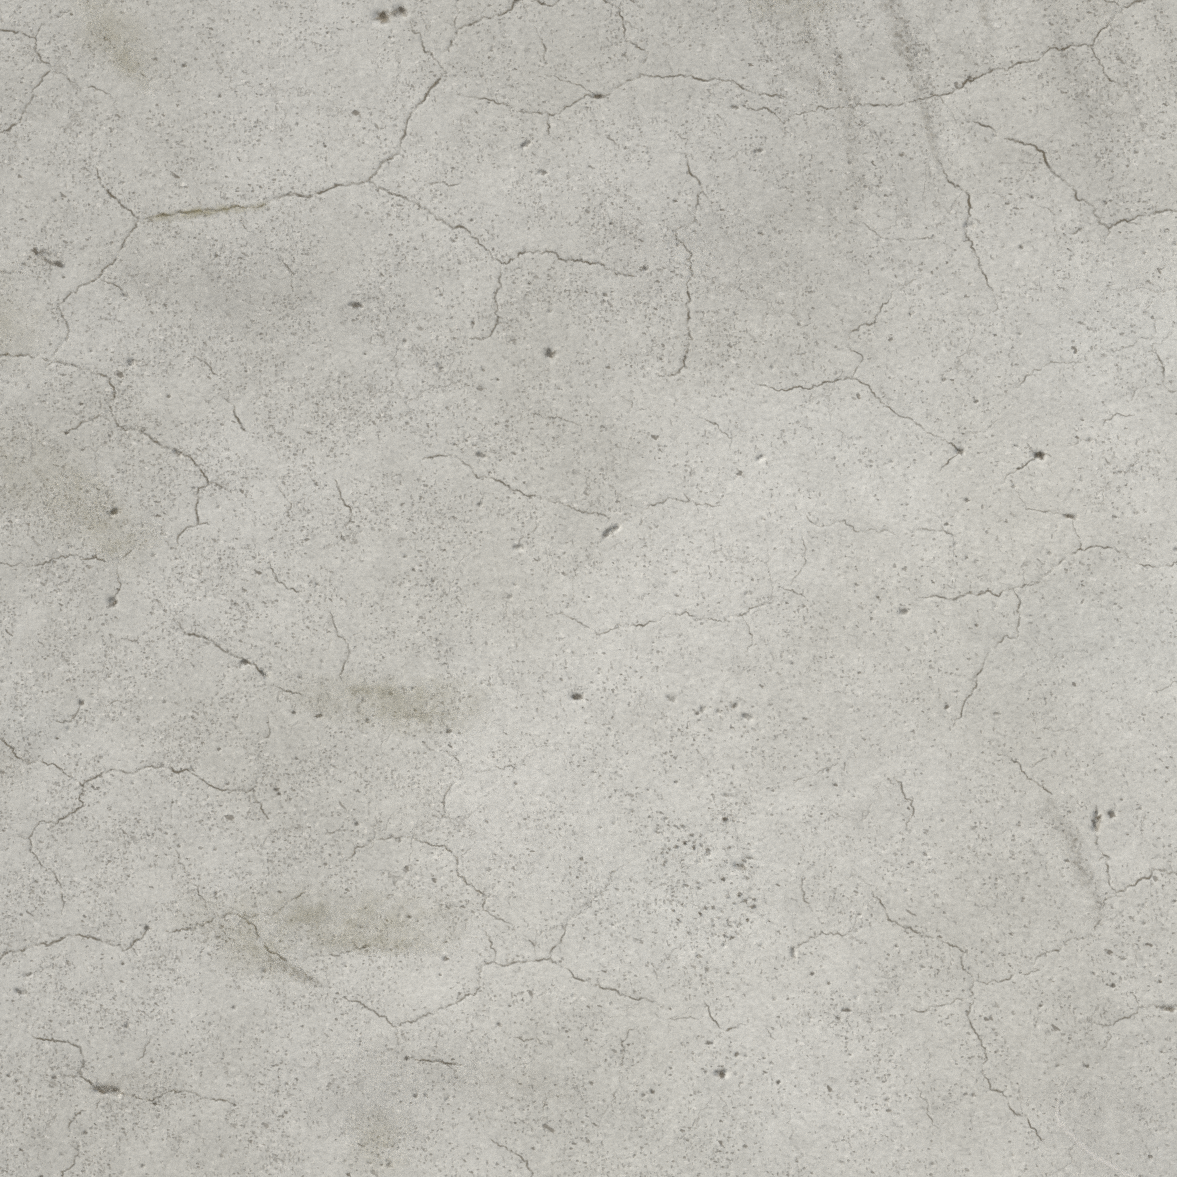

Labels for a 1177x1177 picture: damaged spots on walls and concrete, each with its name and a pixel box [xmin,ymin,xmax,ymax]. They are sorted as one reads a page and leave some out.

crack [604,0,777,114]
crack [918,0,1141,99]
crack [298,79,439,198]
crack [979,123,1050,168]
crack [59,173,264,325]
crack [455,225,603,339]
crack [948,180,989,286]
crack [772,302,893,411]
crack [177,455,222,539]
crack [3,741,112,820]